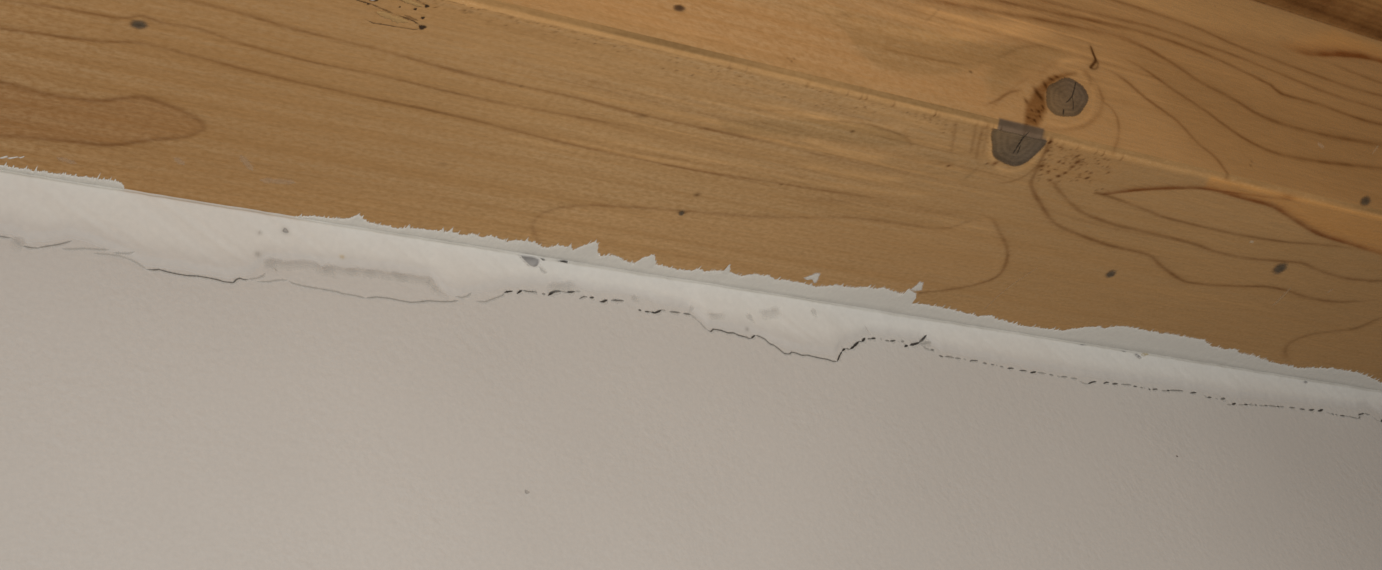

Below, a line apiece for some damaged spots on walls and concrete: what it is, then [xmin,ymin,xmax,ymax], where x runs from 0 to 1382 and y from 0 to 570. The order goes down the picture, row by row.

crack [0,236,1382,422]